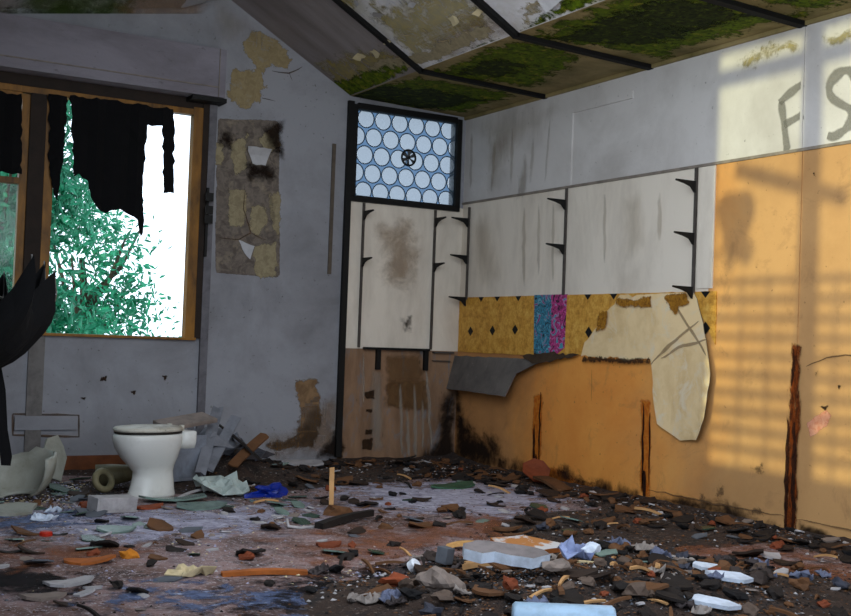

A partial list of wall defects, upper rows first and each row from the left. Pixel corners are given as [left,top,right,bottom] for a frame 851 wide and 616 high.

peeling [227,31,292,109]
damp [370,0,485,54]
damp [743,41,796,67]
damp [829,31,851,45]
peeling [215,118,283,279]
peeling [266,379,322,455]
damp [387,357,427,410]
corrosion [532,392,542,460]
corrosion [640,400,651,497]
peeling [581,292,711,441]
corrosion [784,344,802,528]
crack [807,354,851,366]